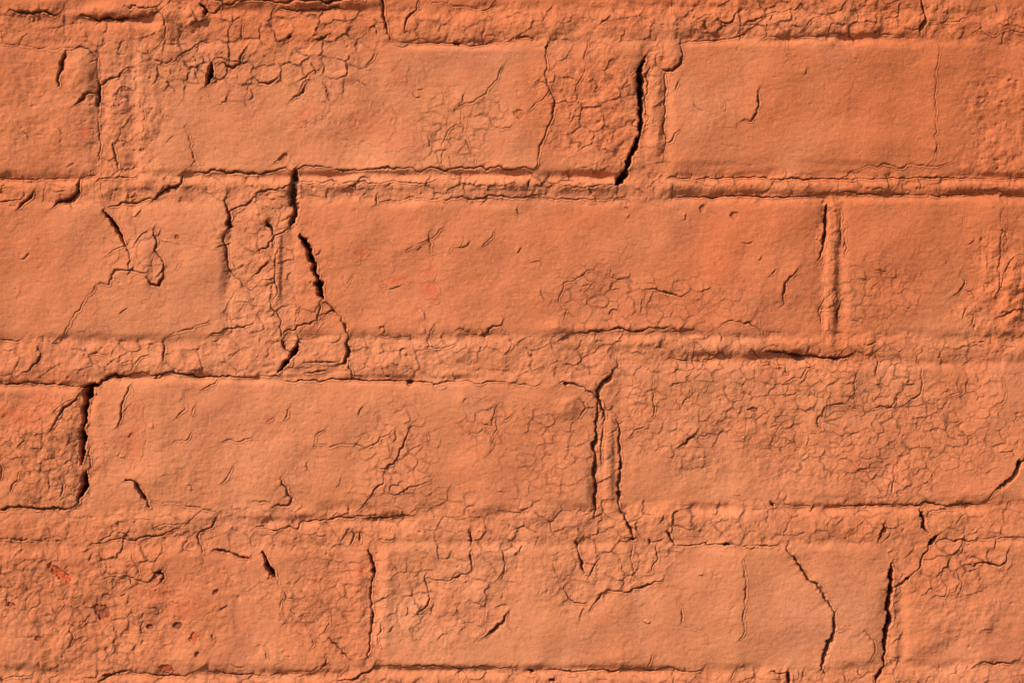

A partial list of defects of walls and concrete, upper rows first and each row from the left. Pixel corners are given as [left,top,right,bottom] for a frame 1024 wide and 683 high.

crack [0,0,1024,513]
crack [0,674,32,682]
crack [0,536,62,544]
crack [66,615,90,647]
crack [90,424,708,683]
crack [556,268,848,683]
crack [831,456,1024,683]